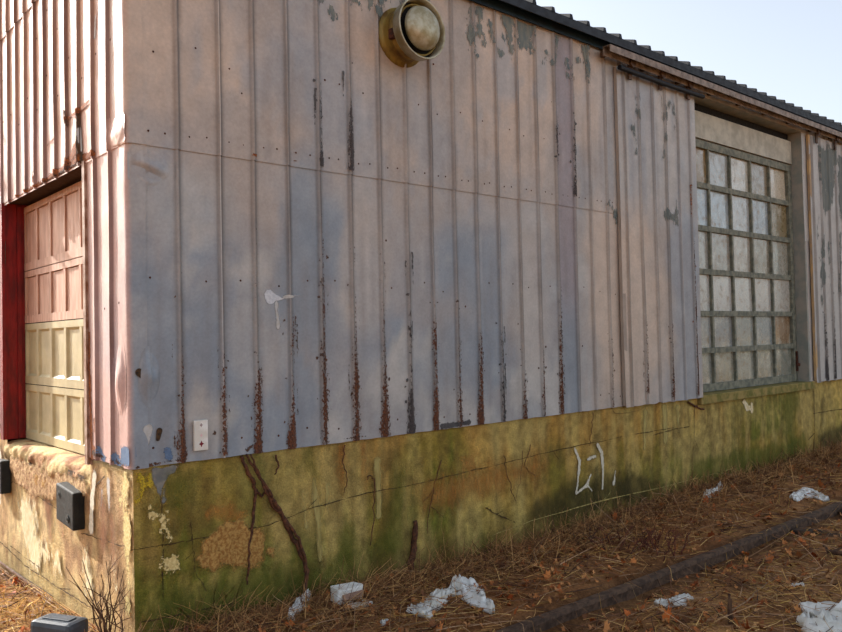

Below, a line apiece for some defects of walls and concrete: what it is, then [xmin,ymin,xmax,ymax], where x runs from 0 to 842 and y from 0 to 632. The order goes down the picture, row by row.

peeling [350,0,405,19]
peeling [465,5,591,85]
peeling [817,144,842,305]
rust [245,351,264,454]
rust [316,240,330,445]
rust [339,311,366,468]
rust [379,302,391,437]
rust [405,364,416,434]
rust [432,321,485,431]
spalling [10,457,86,500]
peeling [95,445,132,617]
leakage [533,477,650,519]